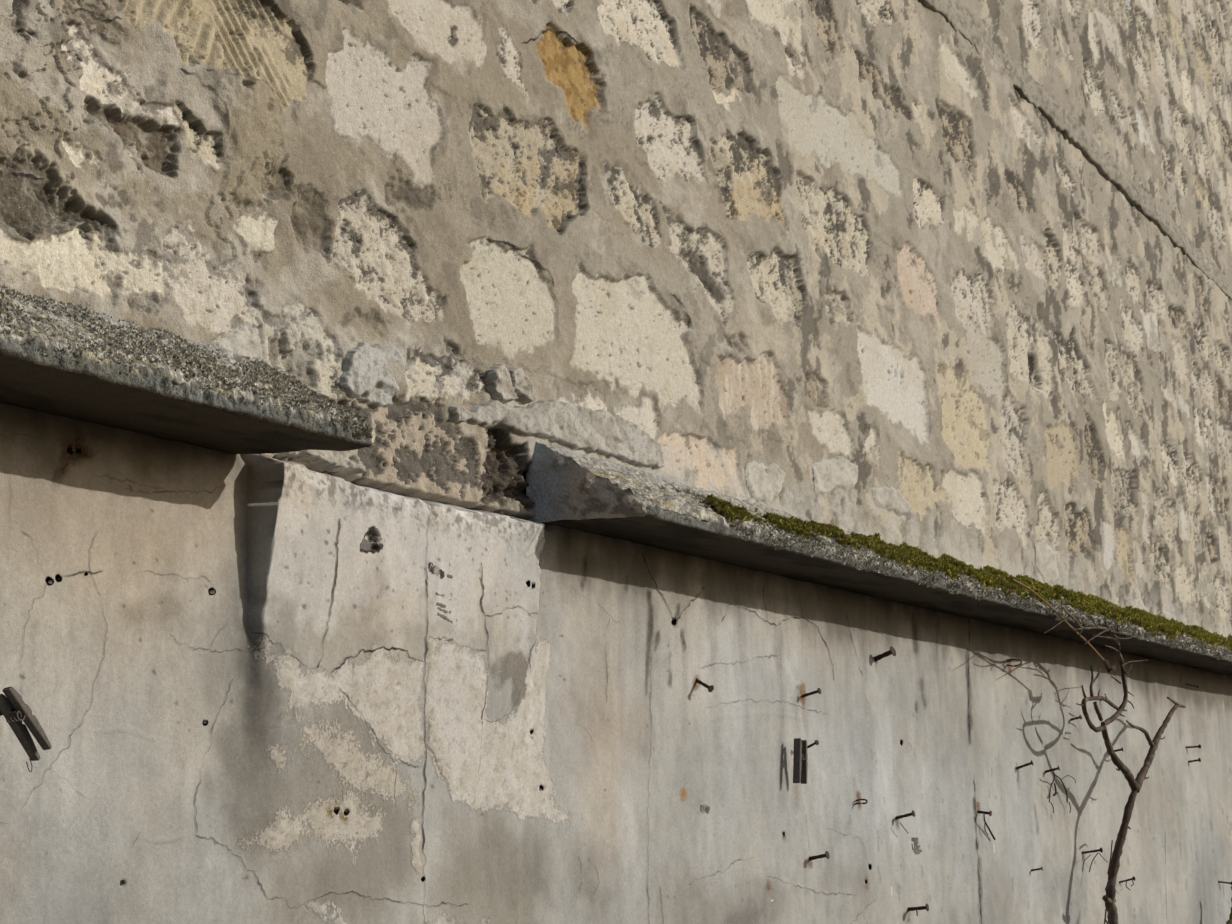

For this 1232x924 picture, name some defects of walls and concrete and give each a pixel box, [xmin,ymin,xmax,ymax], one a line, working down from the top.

crack [254,518,444,692]
spalling [360,526,383,554]
crack [481,563,517,646]
crack [368,713,427,869]
peeling [236,635,573,872]
peeling [304,898,347,924]